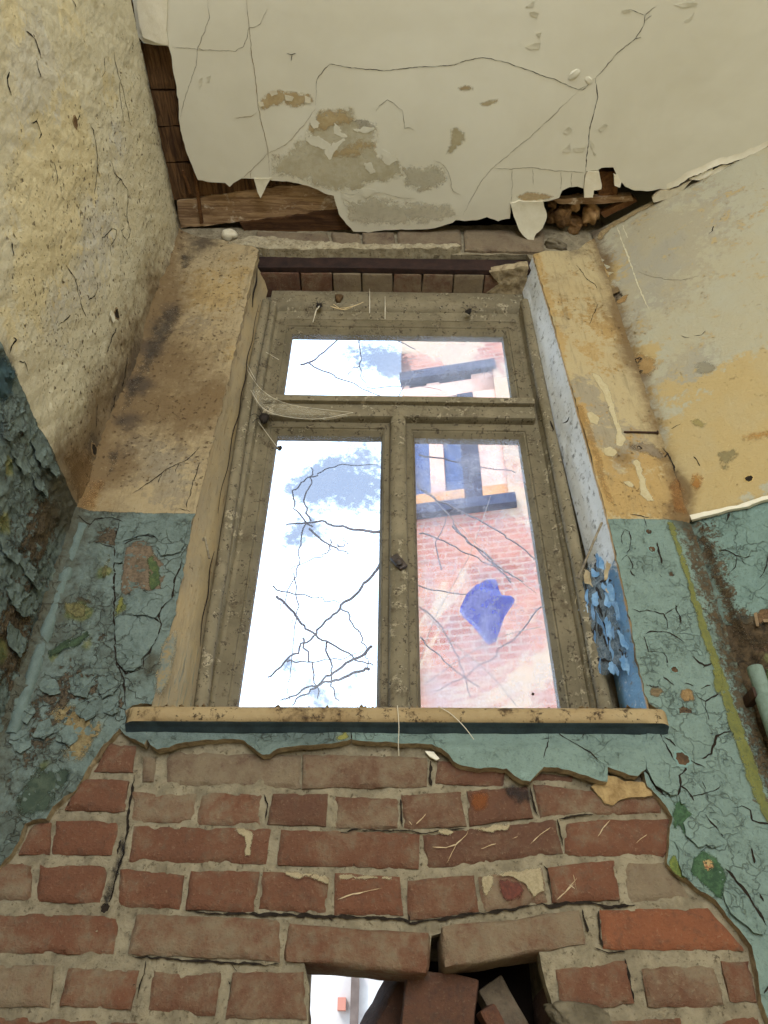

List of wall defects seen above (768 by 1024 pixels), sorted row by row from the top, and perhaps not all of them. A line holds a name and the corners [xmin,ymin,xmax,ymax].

crack [177,1,655,212]
crack [666,141,768,190]
peeling [0,358,61,499]
damp [64,451,102,507]
spalling [690,495,768,522]
peeling [0,536,43,657]
peeling [9,518,189,815]
crack [78,515,182,706]
peeling [575,553,630,676]
crack [634,606,768,836]
spalling [118,725,767,934]
crack [726,848,767,926]